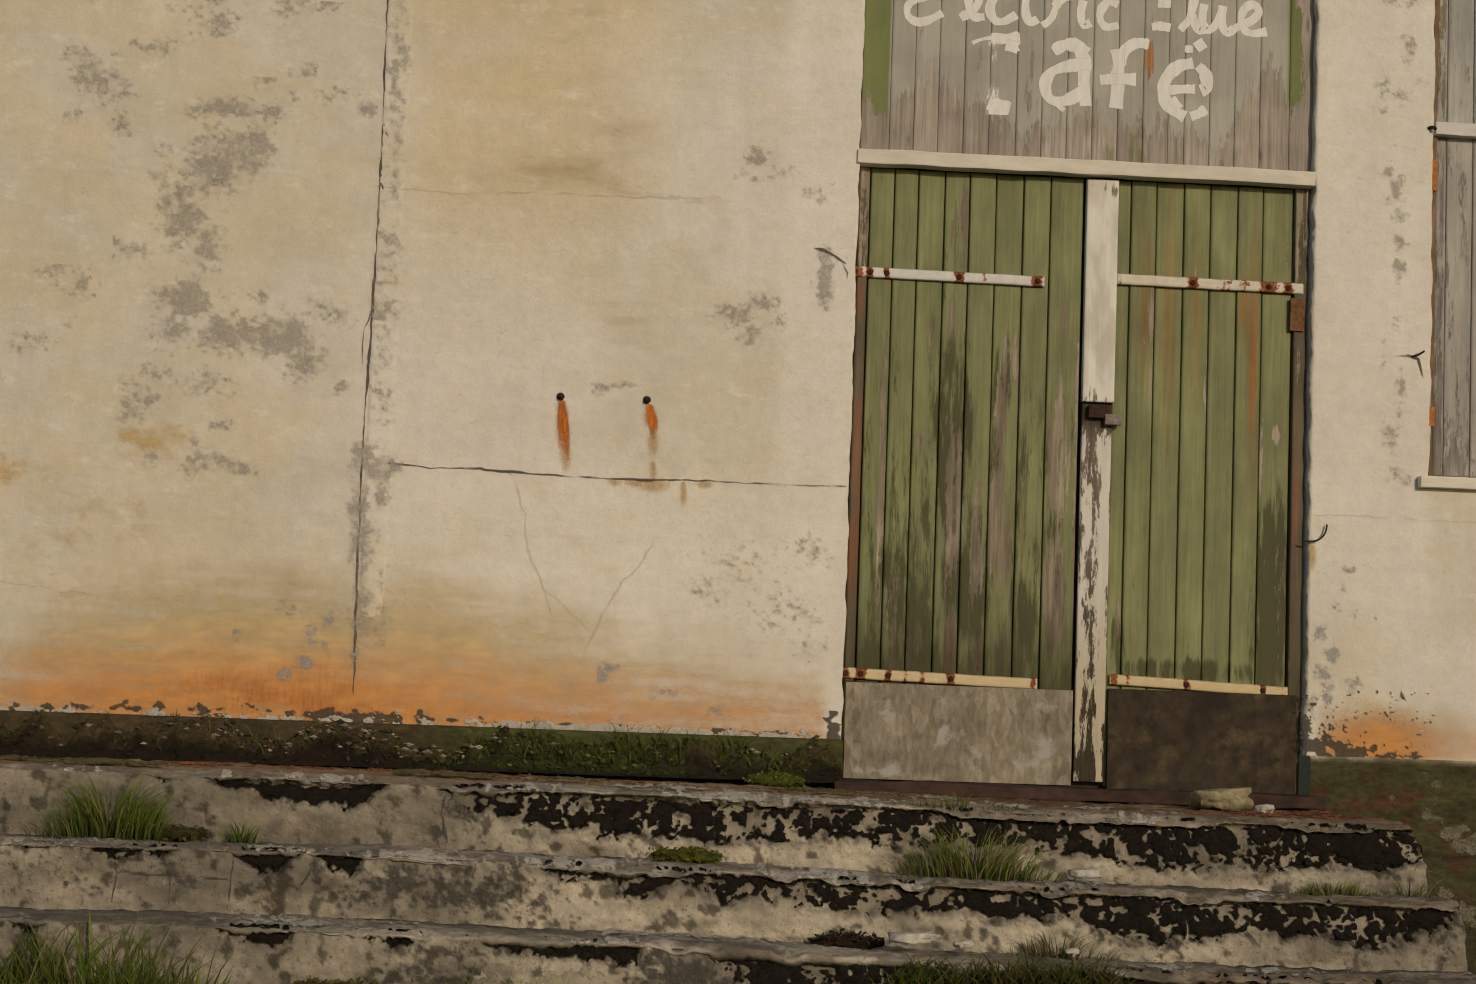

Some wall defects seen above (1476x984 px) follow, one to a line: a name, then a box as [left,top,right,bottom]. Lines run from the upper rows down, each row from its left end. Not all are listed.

peeling [158,99,280,259]
peeling [160,281,321,374]
crack [352,0,847,693]
rust [558,400,569,462]
rust [646,404,658,446]
damp [0,598,773,735]
spalling [1297,627,1440,787]
spalling [0,837,178,859]
spalling [144,760,445,812]
spalling [205,771,1476,984]